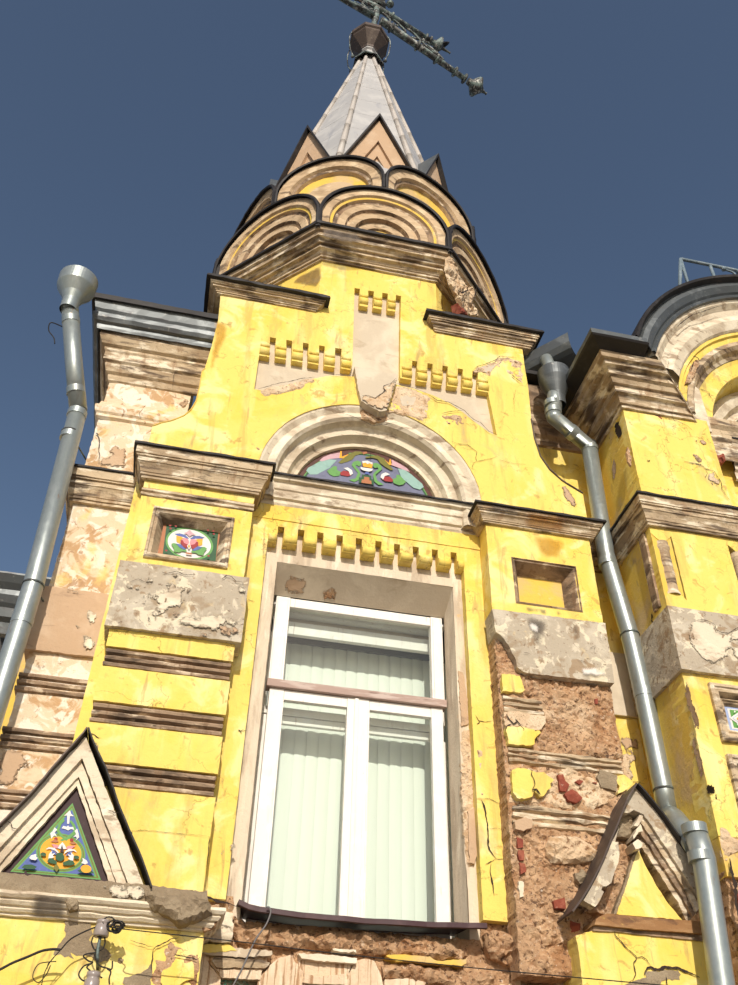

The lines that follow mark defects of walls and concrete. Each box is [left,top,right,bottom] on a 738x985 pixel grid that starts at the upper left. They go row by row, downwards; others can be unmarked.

flaking render [444,256,478,317]
flaking render [473,357,523,383]
flaking render [360,380,431,425]
peeling [76,610,97,649]
peeling [126,573,238,636]
peeling [689,620,738,663]
flaking render [495,638,638,810]
peeling [0,749,28,785]
crack [481,798,502,893]
flaking render [512,818,601,946]
flaking render [151,942,200,985]
crack [614,931,699,985]